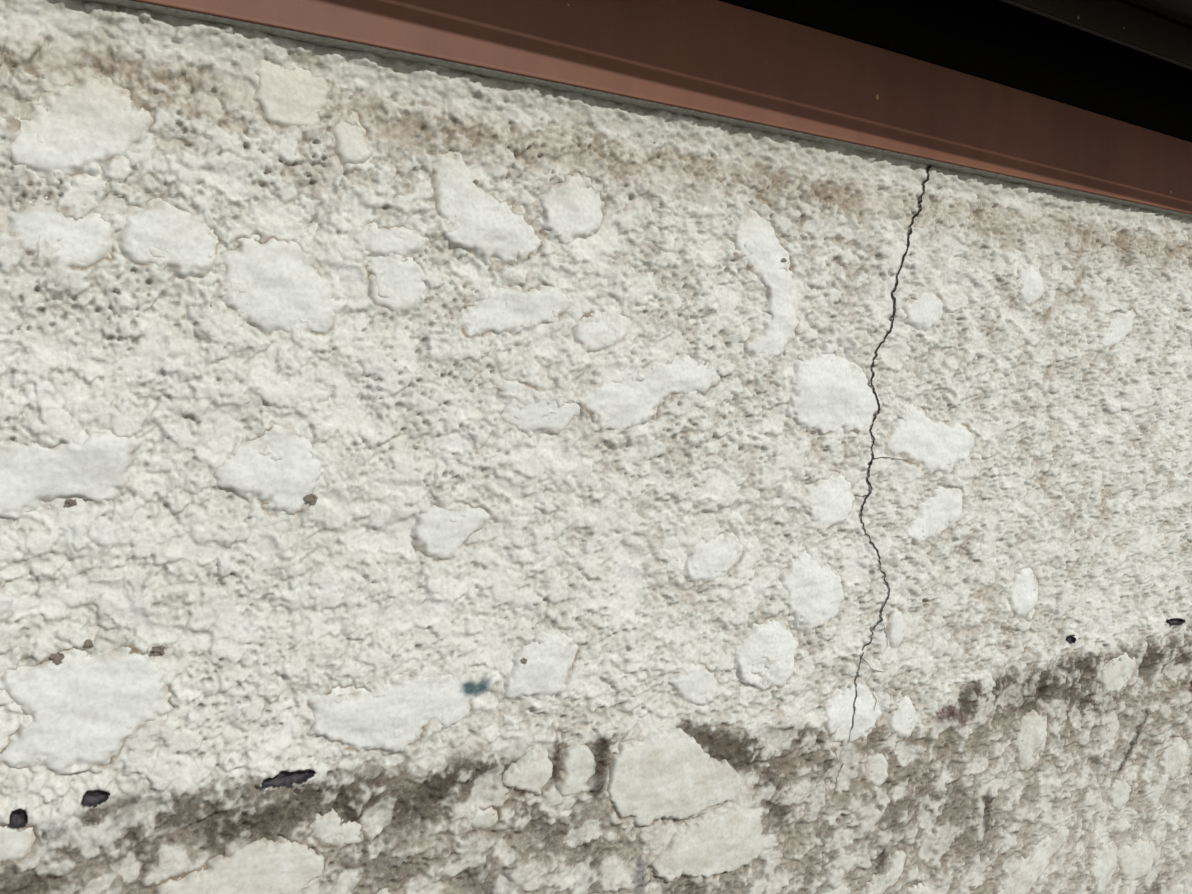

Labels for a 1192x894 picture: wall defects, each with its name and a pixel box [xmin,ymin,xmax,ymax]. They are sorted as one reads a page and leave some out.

crack [834,165,932,794]